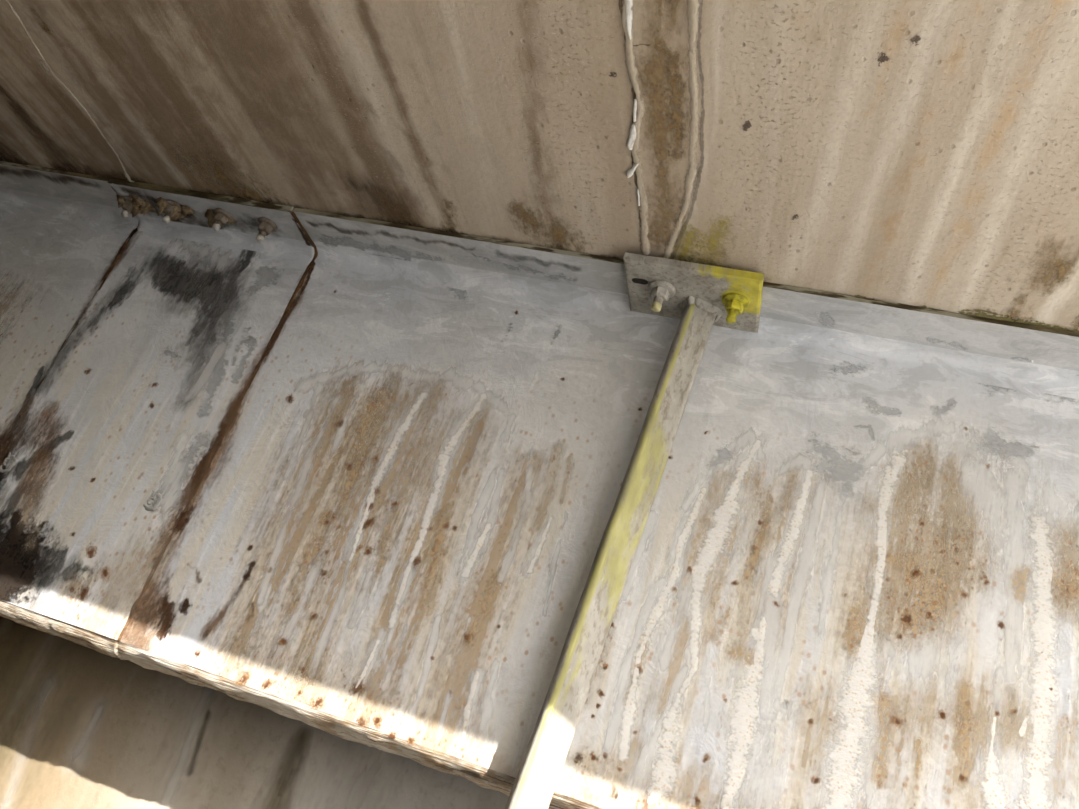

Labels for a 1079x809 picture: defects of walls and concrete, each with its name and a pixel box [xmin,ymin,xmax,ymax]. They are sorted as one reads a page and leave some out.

corrosion [101,229,137,281]
damp [0,240,278,606]
corrosion [65,261,315,651]
corrosion [203,372,574,761]
damp [634,0,685,248]
crack [619,0,705,259]
damp [604,430,764,805]
corrosion [659,468,803,713]
damp [720,455,824,809]
damp [819,420,954,809]
corrosion [843,443,989,655]
damp [963,431,1079,809]